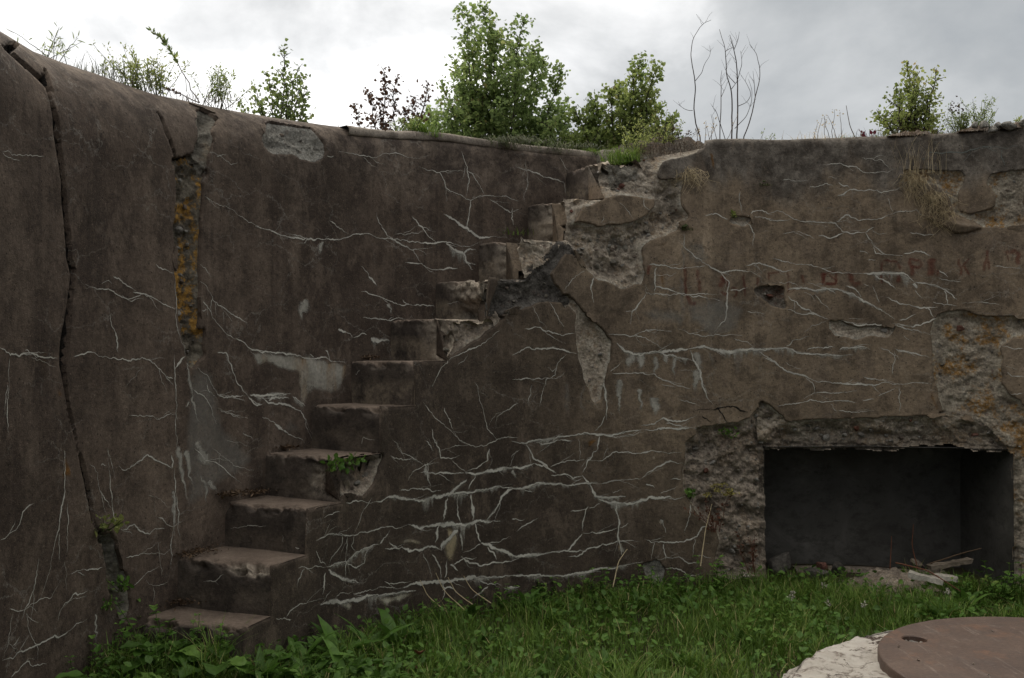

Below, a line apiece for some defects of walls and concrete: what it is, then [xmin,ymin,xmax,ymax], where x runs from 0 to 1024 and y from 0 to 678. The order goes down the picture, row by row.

spalling [185,102,216,176]
crack [1,44,459,676]
spalling [261,122,324,162]
crack [205,151,566,272]
spalling [443,149,699,403]
crack [278,155,1000,621]
spalling [754,281,786,309]
spalling [682,310,1024,587]